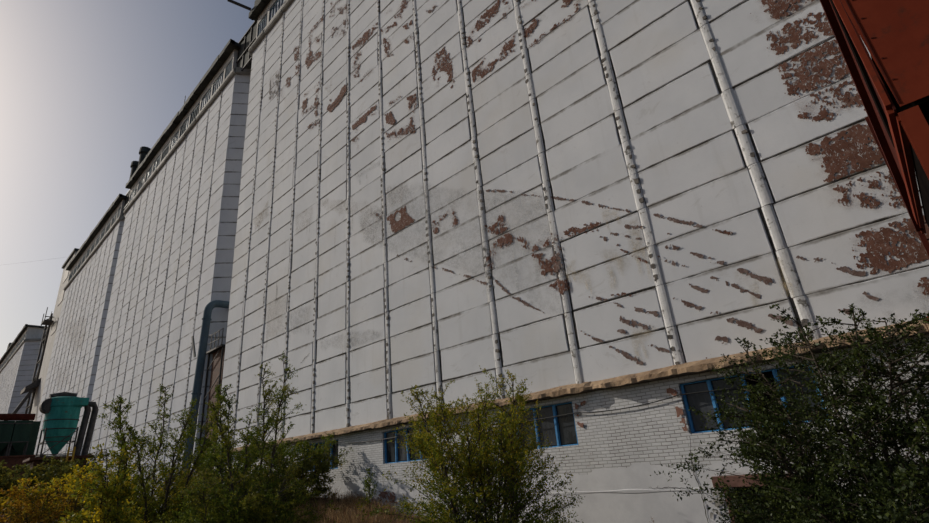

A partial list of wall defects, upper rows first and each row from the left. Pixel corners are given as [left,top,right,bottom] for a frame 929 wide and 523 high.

peeling [268,0,349,100]
peeling [301,82,346,128]
peeling [352,0,414,82]
peeling [352,93,417,142]
peeling [431,46,455,88]
peeling [466,0,579,82]
peeling [761,0,865,122]
peeling [376,206,415,233]
peeling [796,124,929,277]
peeling [431,215,648,313]
peeling [589,292,659,334]
peeling [673,297,763,333]